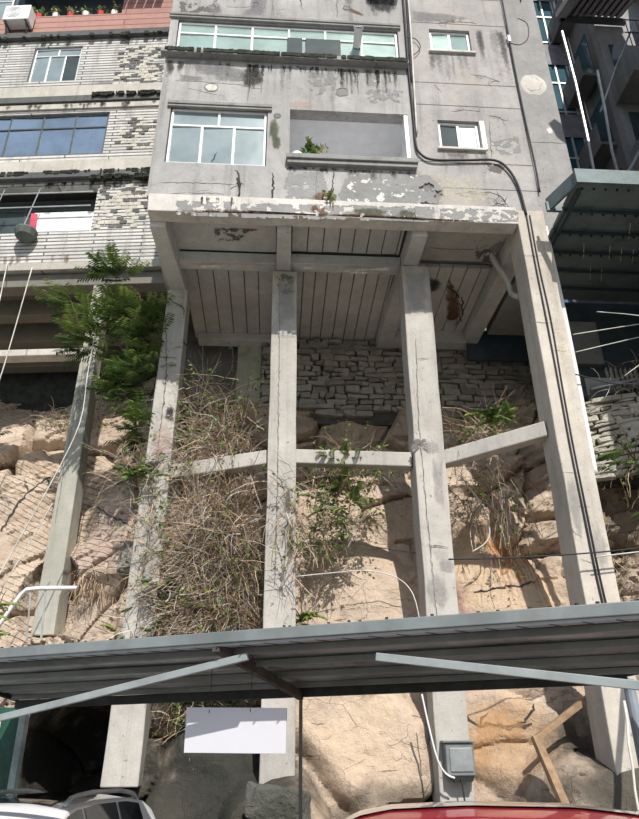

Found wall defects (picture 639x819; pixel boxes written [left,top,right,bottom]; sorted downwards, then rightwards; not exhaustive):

leakage [369,0,394,11]
leakage [167,60,272,88]
leakage [284,66,397,87]
crack [161,170,241,197]
peeling [176,169,519,222]